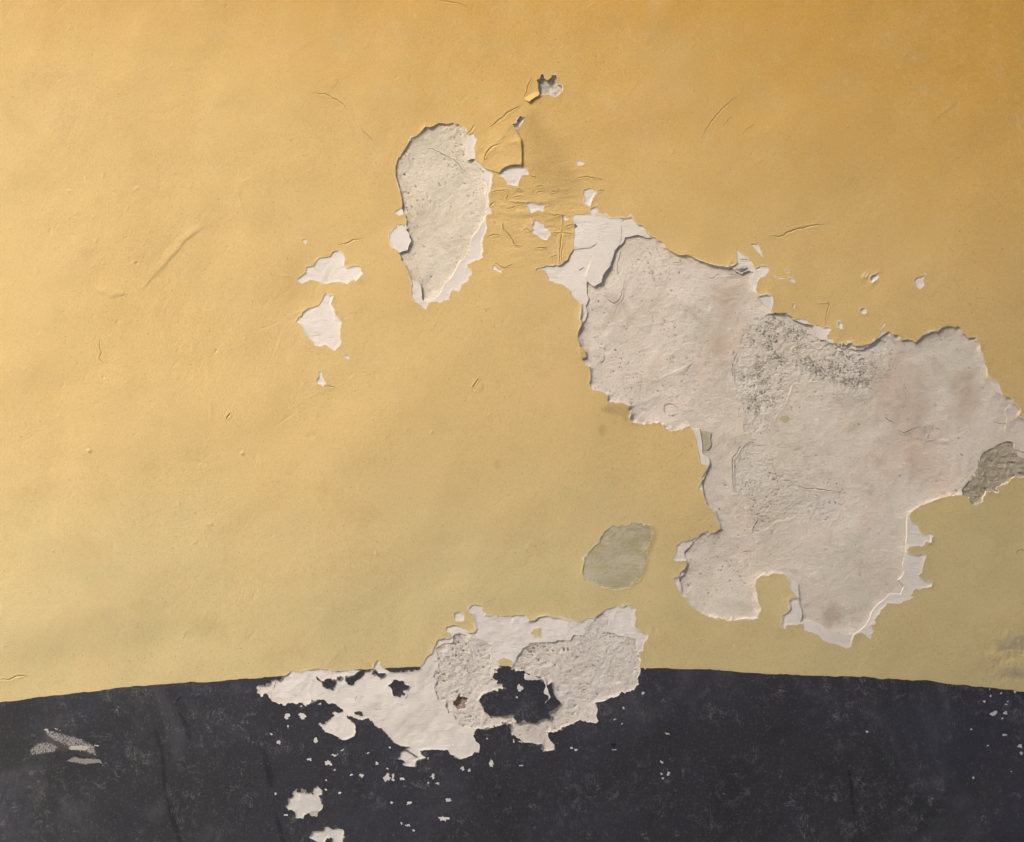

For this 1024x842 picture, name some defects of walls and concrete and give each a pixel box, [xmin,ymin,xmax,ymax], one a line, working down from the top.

spalling [524,75,562,102]
peeling [389,116,529,309]
crack [487,174,604,272]
peeling [296,251,363,359]
peeling [536,188,1024,648]
peeling [257,605,648,819]
peeling [309,827,344,842]